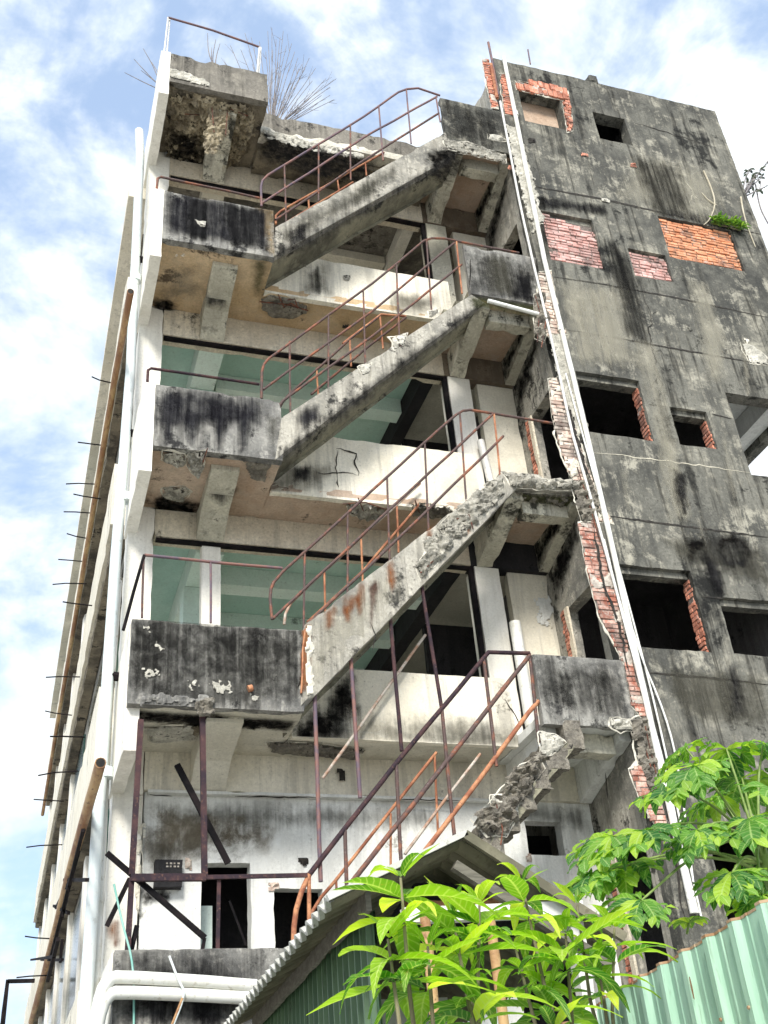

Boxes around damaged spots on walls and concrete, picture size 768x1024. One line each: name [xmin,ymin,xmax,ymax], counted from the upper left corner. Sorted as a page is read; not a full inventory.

spalling [165,68,364,169]
damp [169,196,273,247]
damp [537,196,606,247]
spalling [259,294,309,319]
damp [611,245,643,337]
damp [516,338,538,403]
damp [156,391,260,450]
crack [536,344,768,685]
spalling [410,270,667,845]
corrosion [344,565,394,620]
damp [132,620,298,705]
mould [298,680,359,738]